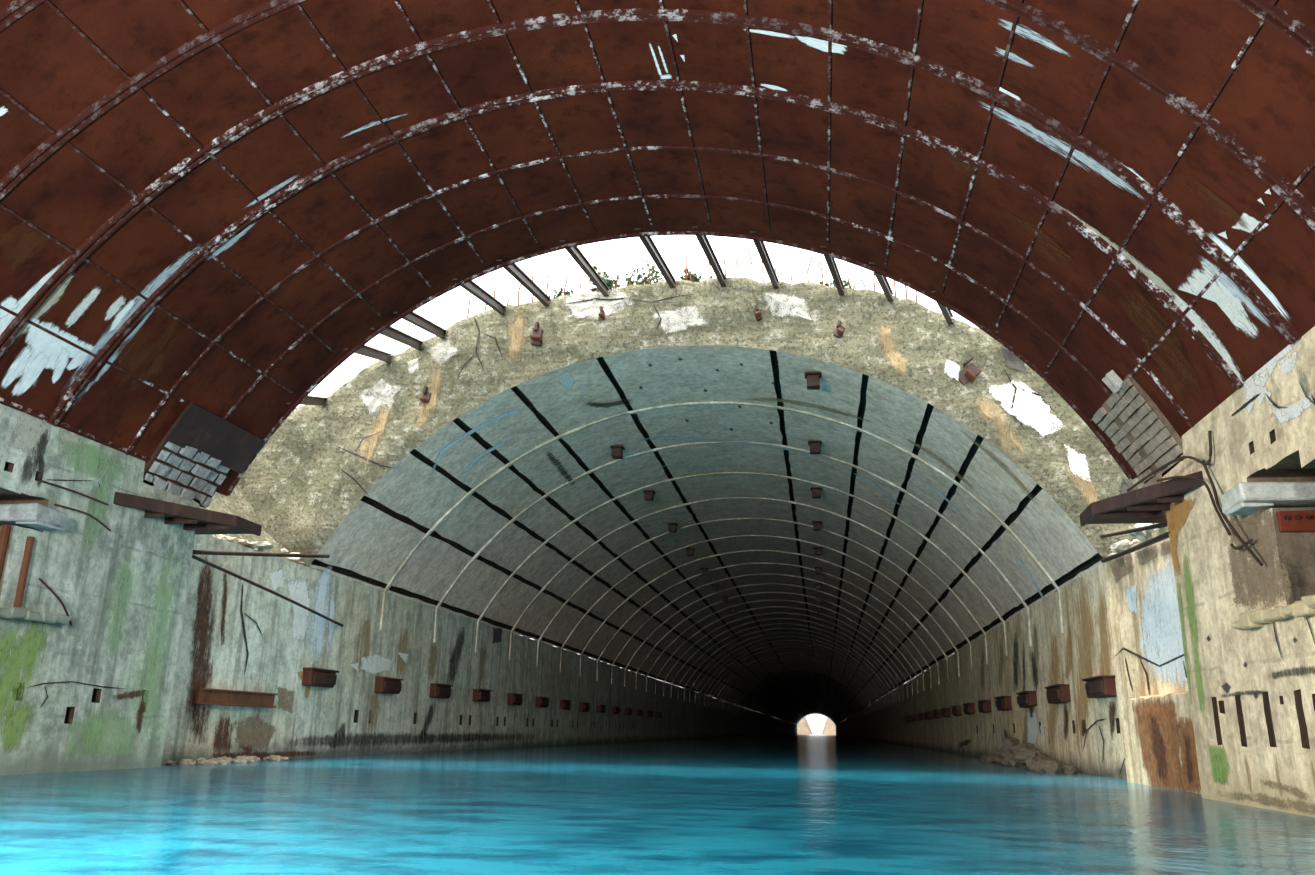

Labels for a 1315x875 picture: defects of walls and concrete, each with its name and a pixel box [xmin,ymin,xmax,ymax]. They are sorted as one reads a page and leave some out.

peeling [745,29,847,54]
peeling [1001,19,1068,55]
peeling [983,87,1143,198]
peeling [0,223,255,405]
peeling [564,287,632,319]
peeling [1056,204,1314,423]
rust [751,398,870,422]
spalling [989,345,1062,436]
rust [963,432,1034,501]
peeling [1110,541,1188,688]
water stain [0,621,46,751]
rust [1132,698,1201,793]